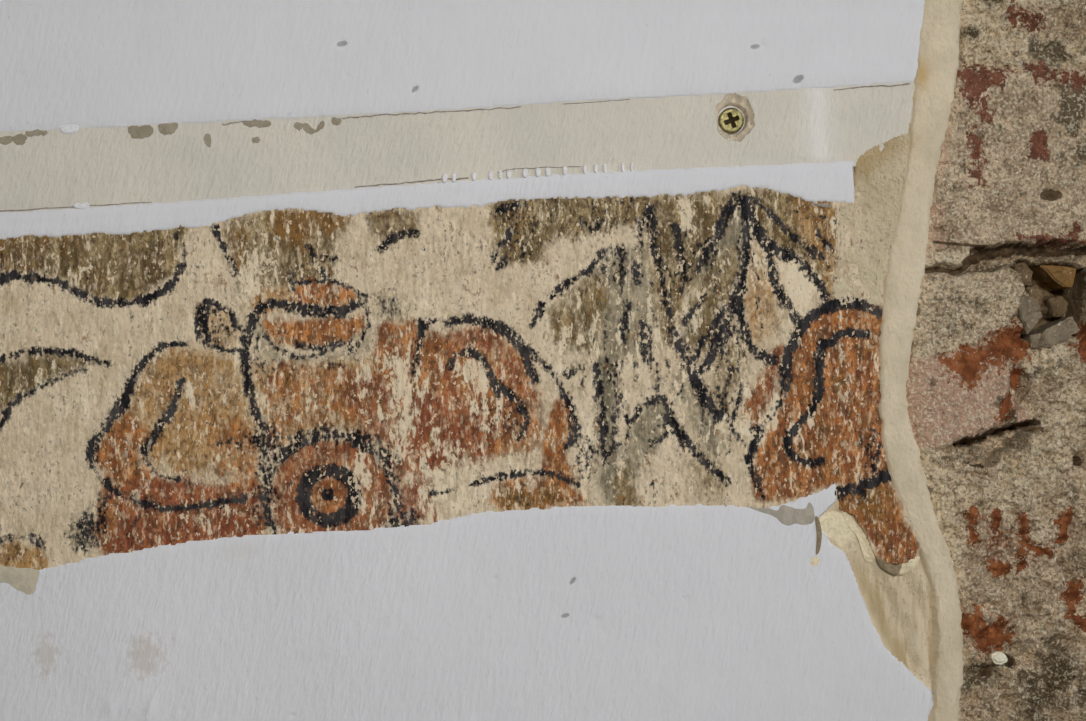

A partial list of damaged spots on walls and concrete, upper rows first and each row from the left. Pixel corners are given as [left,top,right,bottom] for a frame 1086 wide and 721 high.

crack [925,241,1086,276]
spalling [937,218,1086,426]
crack [952,419,1041,468]